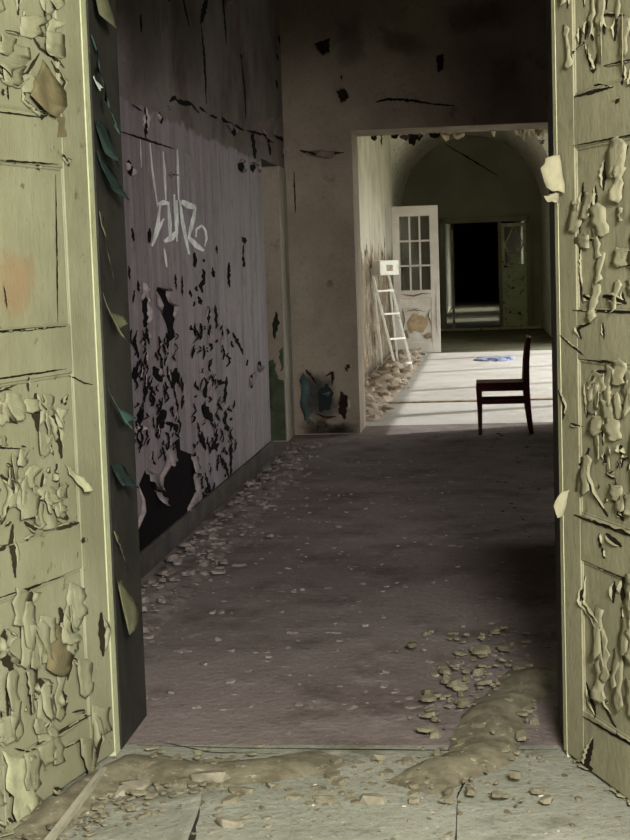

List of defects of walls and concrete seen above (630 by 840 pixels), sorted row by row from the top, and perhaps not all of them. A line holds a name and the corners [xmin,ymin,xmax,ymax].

peeling [0,0,69,138]
peeling [96,0,117,28]
peeling [91,35,287,201]
spalling [314,38,330,56]
spalling [336,75,349,103]
peeling [371,132,465,149]
peeling [103,252,286,552]
peeling [299,370,350,420]
peeling [0,369,113,837]
peeling [114,531,139,635]